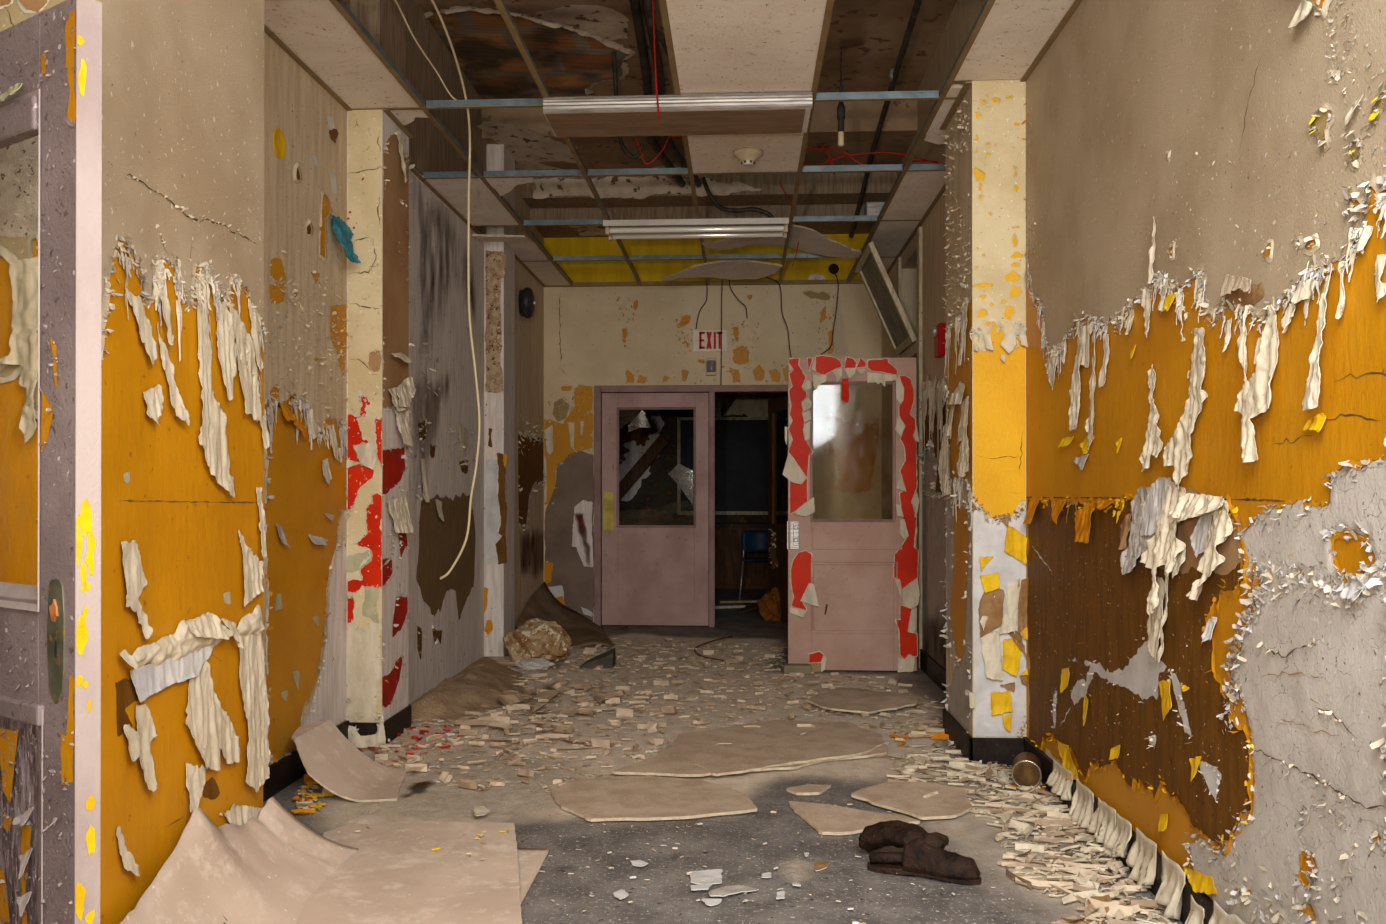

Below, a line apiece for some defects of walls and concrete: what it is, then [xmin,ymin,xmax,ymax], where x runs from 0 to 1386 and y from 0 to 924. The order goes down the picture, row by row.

spalling [424,5,636,99]
crack [126,173,257,262]
flaking render [617,0,1386,924]
peeling [0,114,594,924]
peeling [613,889,629,900]